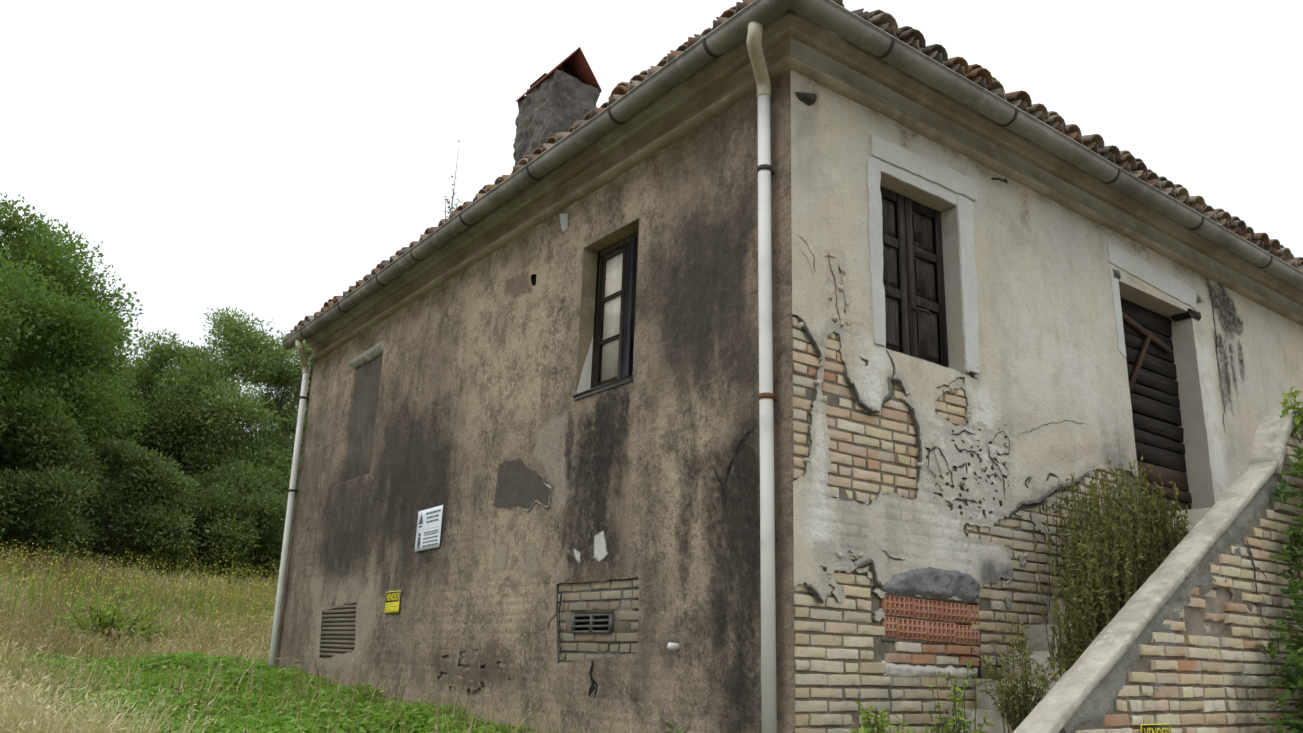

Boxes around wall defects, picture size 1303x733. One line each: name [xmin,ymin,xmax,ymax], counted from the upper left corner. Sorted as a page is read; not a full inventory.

leakage [553,213,568,232]
leakage [1197,283,1244,406]
leakage [319,398,456,595]
flaking render [493,412,579,514]
leakage [562,387,629,577]
flaking render [789,266,1136,733]
crack [547,593,562,654]
crack [588,660,597,697]
leakage [676,417,760,733]
spalling [1203,589,1224,634]